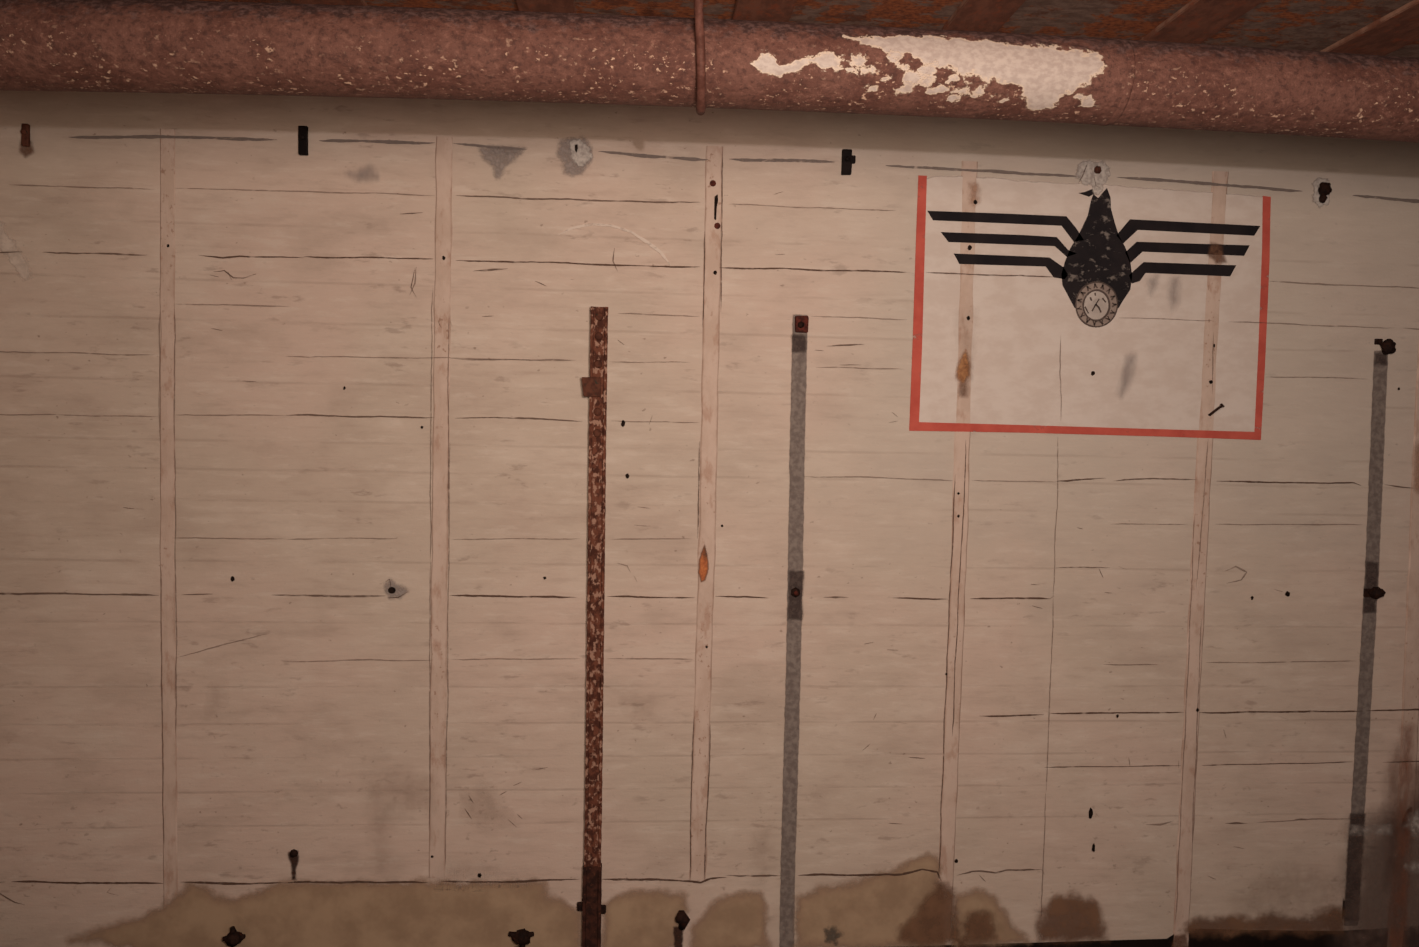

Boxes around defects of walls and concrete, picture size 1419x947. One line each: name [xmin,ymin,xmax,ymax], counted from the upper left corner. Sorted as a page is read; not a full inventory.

peeling [750,34,1107,111]
leakage [70,881,582,947]
leakage [602,891,768,947]
leakage [796,855,1105,947]
leakage [1186,809,1419,947]